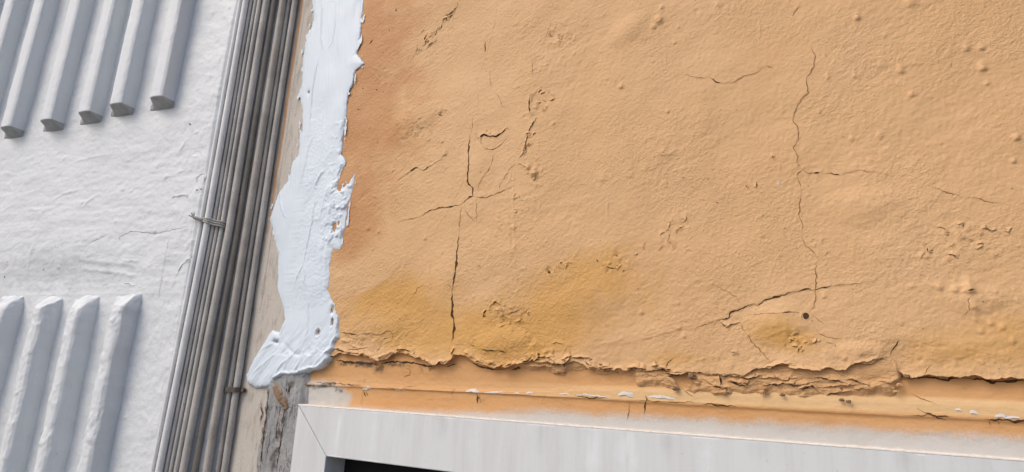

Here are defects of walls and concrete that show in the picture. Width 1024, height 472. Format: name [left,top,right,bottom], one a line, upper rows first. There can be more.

crack [317,72,533,404]
flaking render [335,330,910,403]
crack [696,50,876,362]